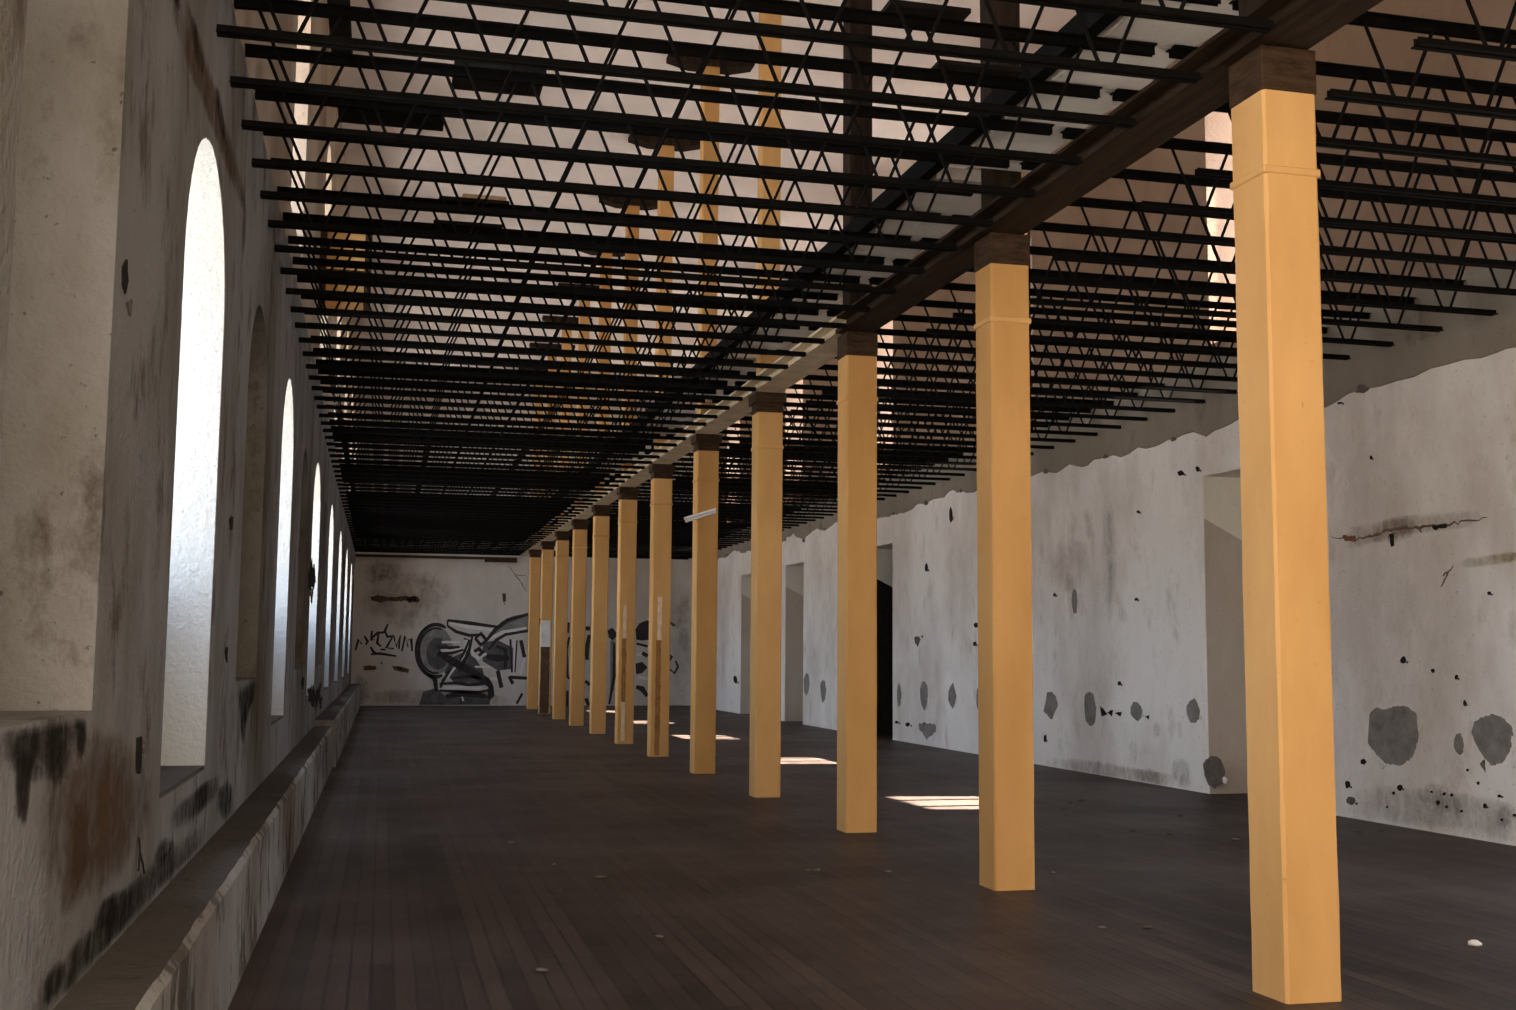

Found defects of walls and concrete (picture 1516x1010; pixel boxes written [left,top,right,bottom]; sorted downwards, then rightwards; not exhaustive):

crack [1331,517,1487,547]
spalling [1044,692,1059,742]
spalling [1084,692,1150,726]
spalling [1186,698,1203,723]
spalling [1360,705,1423,769]
spalling [1454,700,1516,785]
damp [9,722,86,821]
damp [177,782,232,820]
damp [45,838,193,1001]